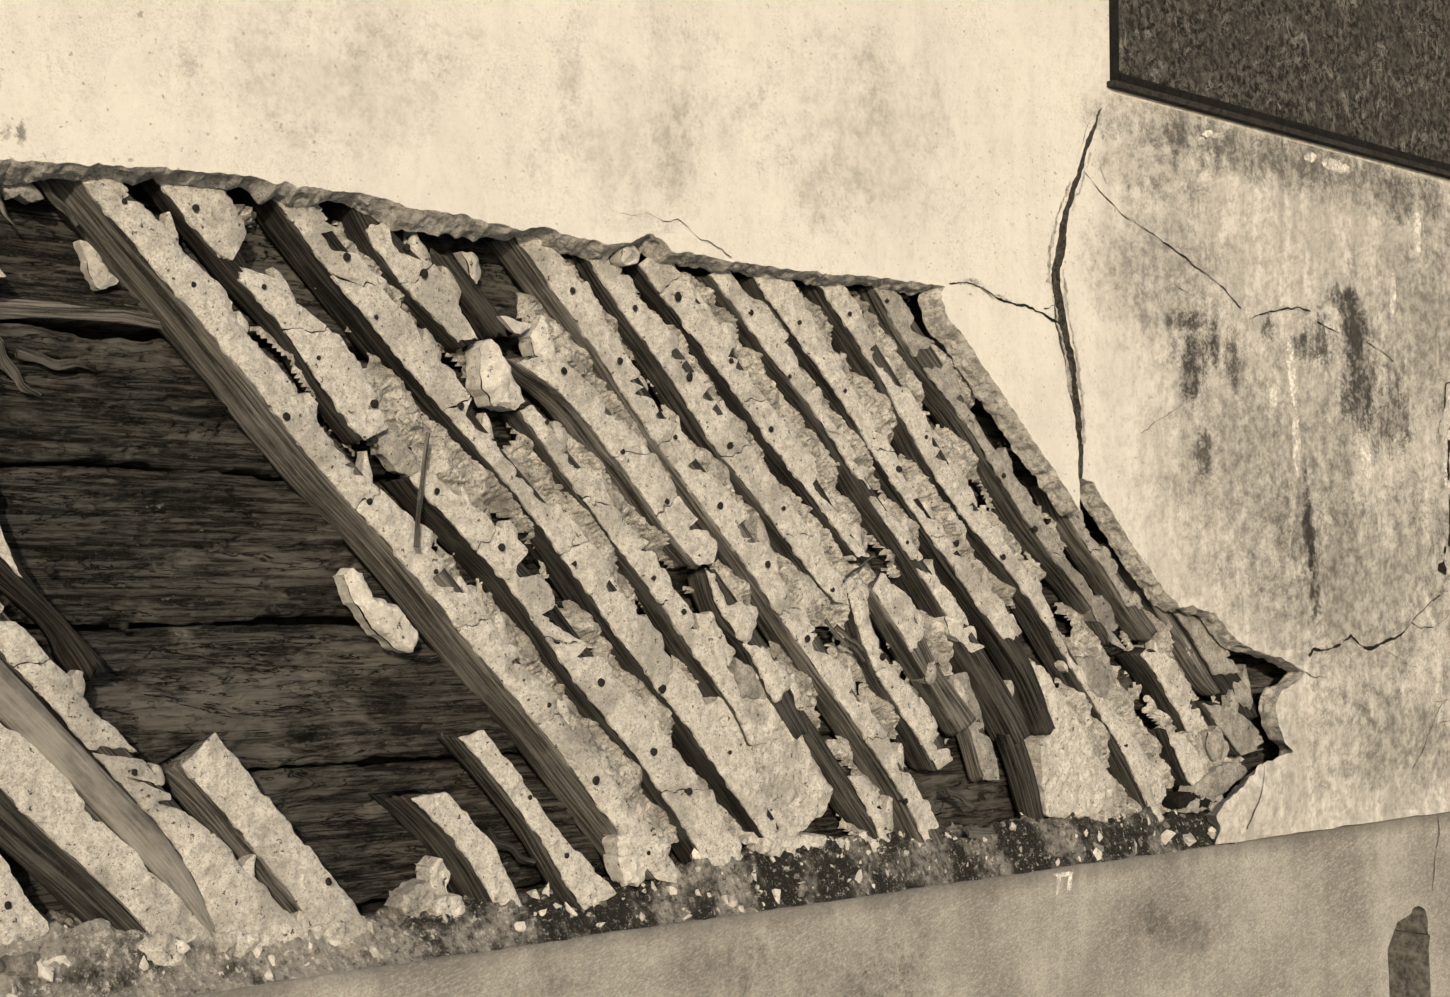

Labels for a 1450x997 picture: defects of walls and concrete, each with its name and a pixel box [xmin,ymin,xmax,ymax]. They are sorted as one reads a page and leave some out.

damp [1413,202,1421,255]
spalling [0,159,1305,757]
crack [949,108,1394,478]
damp [1167,312,1240,398]
damp [1197,433,1211,475]
damp [1262,317,1327,477]
damp [1331,283,1411,479]
damp [1302,491,1320,615]
crack [1306,382,1450,678]
crack [1412,686,1450,769]
spalling [1206,769,1256,845]